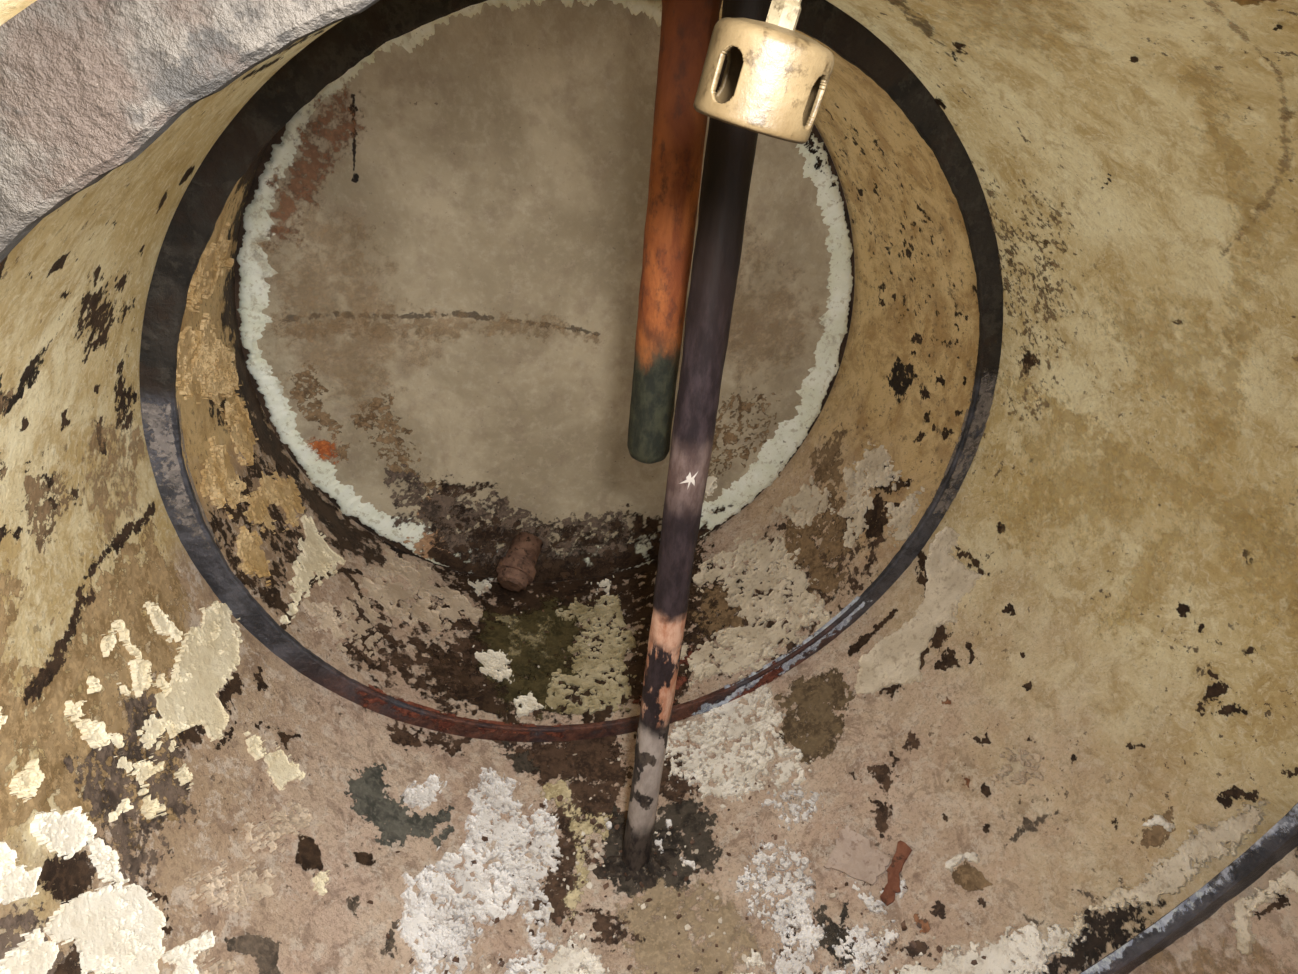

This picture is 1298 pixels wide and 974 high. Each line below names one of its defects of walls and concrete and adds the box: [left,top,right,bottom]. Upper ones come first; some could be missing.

spalling [74,265,135,364]
water stain [207,140,387,614]
peeling [0,600,244,974]
water stain [295,834,324,871]
corrosion [357,684,564,738]
peeling [397,767,610,974]
water stain [333,464,772,974]
corrosion [673,641,700,703]
corrosion [720,661,784,707]
water stain [673,423,912,764]
corrosion [913,913,931,933]
peeling [664,440,1270,974]